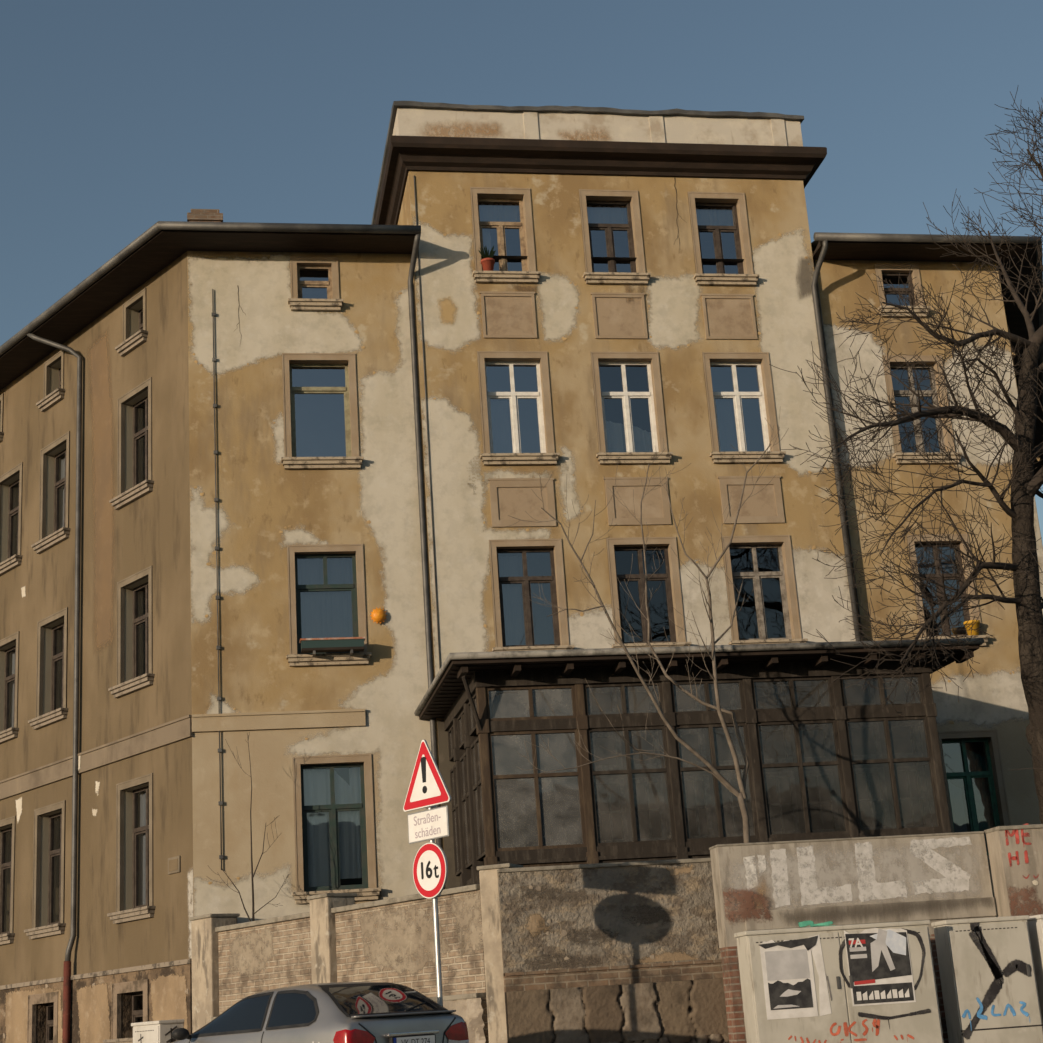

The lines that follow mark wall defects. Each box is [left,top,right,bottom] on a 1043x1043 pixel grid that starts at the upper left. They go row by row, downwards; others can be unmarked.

peeling [188,255,365,374]
peeling [647,275,700,349]
peeling [752,229,894,475]
peeling [190,486,259,623]
peeling [279,525,327,545]
peeling [289,221,586,975]
peeling [932,670,1029,727]